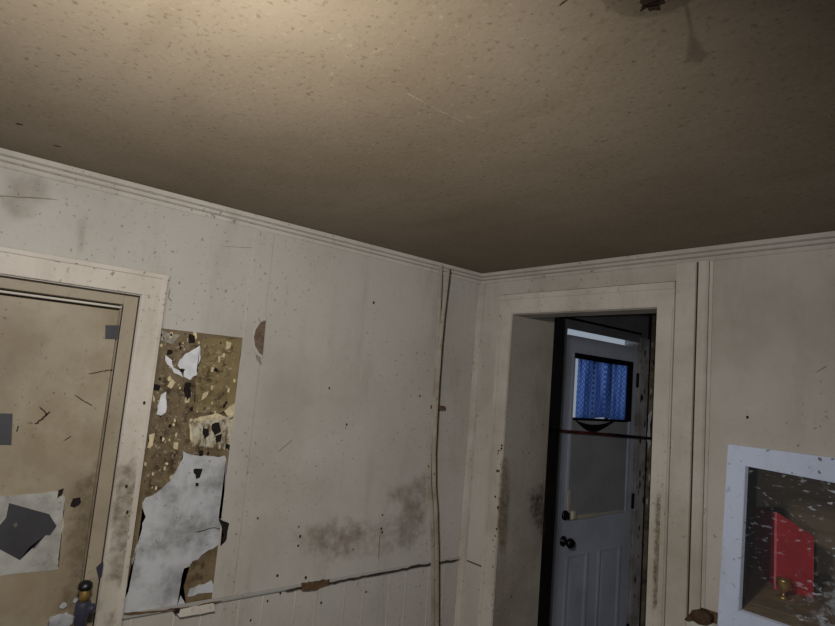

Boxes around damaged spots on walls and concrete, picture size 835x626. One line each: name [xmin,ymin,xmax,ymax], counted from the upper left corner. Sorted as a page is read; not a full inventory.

peeling [123,329,243,617]